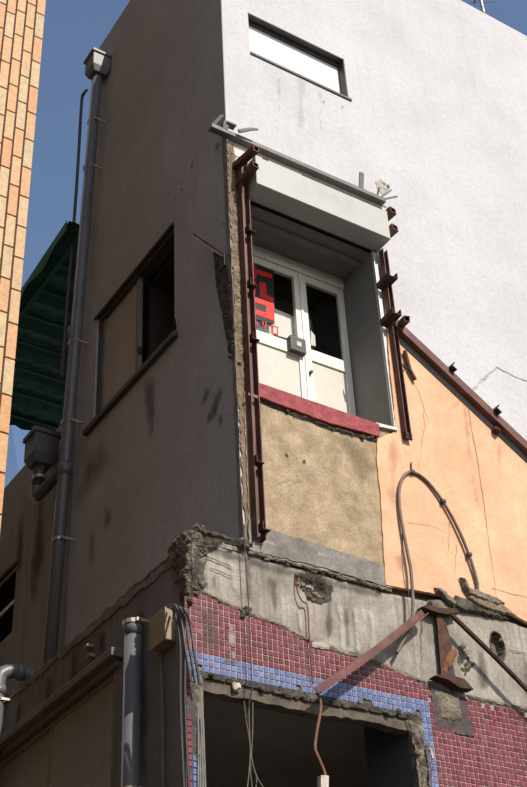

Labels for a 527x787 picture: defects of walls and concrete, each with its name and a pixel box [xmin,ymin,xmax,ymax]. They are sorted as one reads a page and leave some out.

flaking render [213,152,246,390]
spalling [168,524,426,685]
flaking render [427,577,517,619]
crack [468,408,525,598]